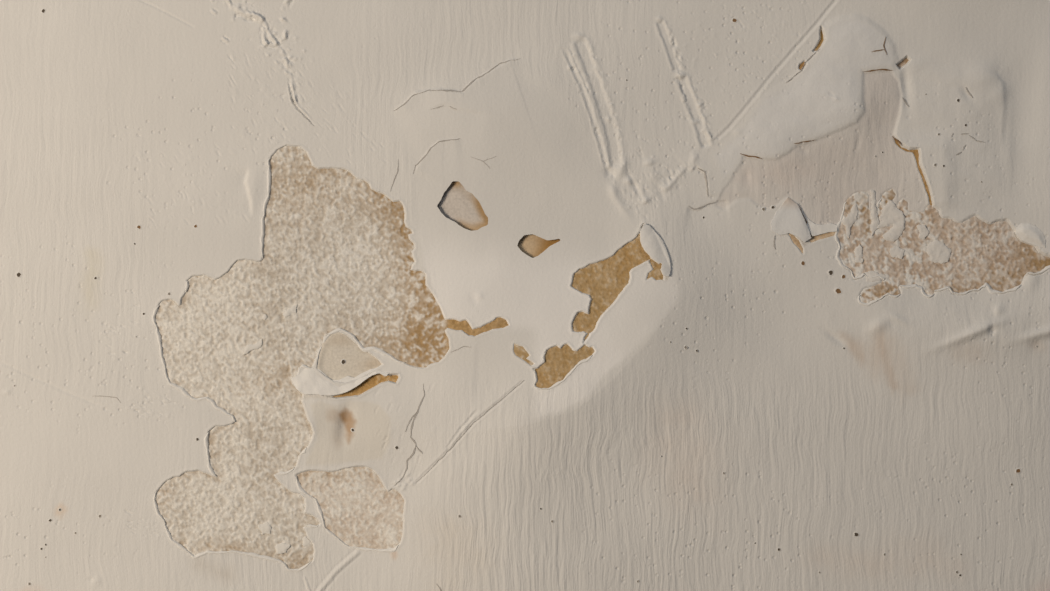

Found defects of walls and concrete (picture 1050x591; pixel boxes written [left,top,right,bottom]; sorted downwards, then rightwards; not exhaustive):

crack [394,59,517,111]
crack [390,138,496,192]
spalling [718,54,1050,307]
peeling [640,224,671,280]
spalling [152,146,509,571]
peeling [514,344,534,365]